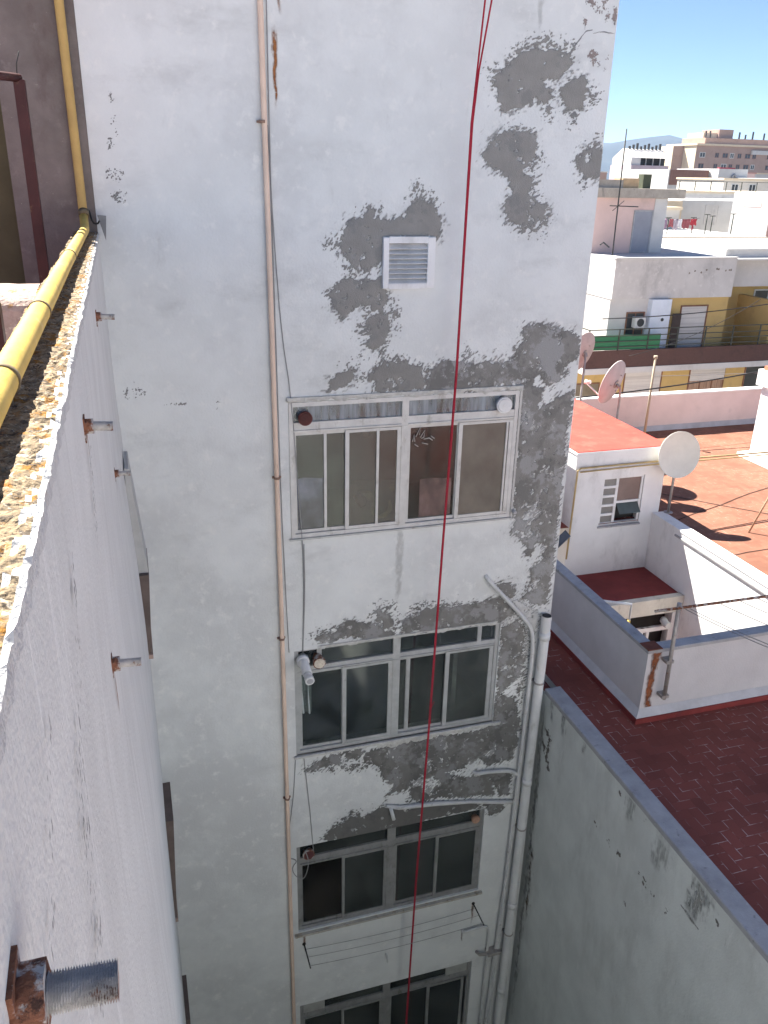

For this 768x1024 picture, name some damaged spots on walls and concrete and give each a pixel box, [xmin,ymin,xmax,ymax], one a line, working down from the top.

peeling [493,620,531,730]
rust [645,652,662,707]
peeling [483,804,504,816]